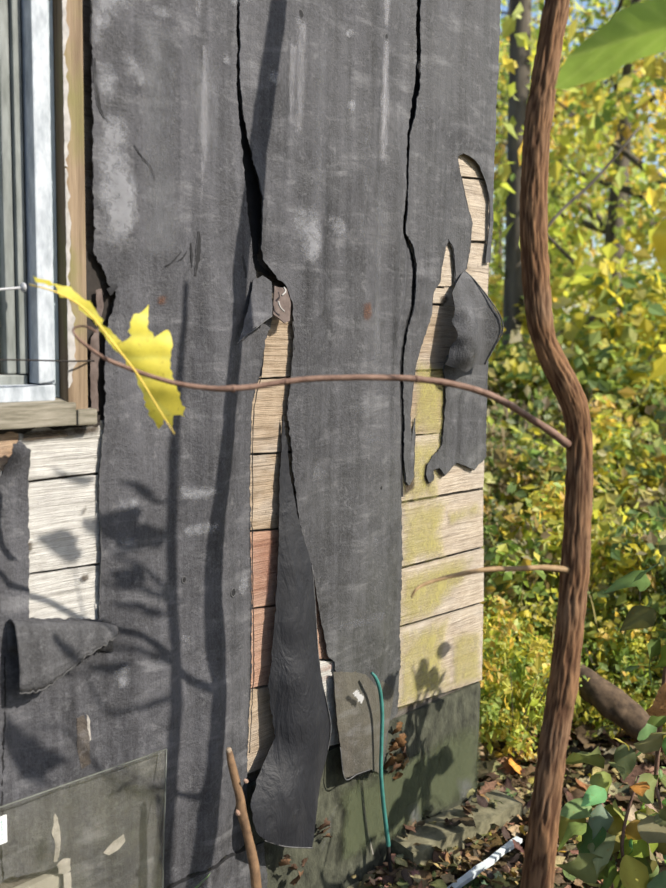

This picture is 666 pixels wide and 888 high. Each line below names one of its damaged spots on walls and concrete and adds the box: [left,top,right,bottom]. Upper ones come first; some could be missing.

peeling [62,0,71,286]
crack [236,63,270,278]
crack [408,51,420,130]
peeling [0,252,111,620]
peeling [236,153,504,849]
crack [399,237,415,497]